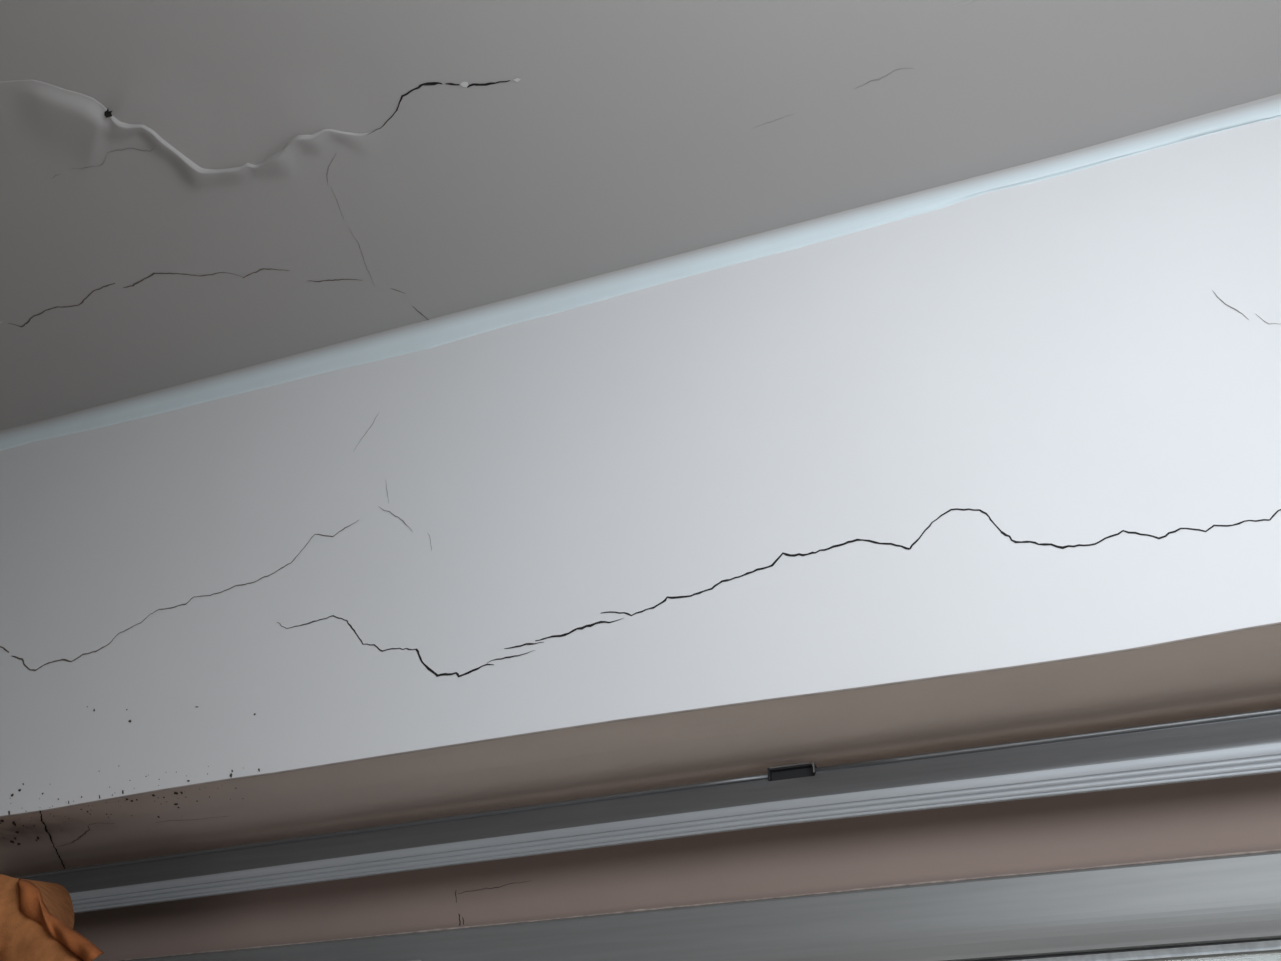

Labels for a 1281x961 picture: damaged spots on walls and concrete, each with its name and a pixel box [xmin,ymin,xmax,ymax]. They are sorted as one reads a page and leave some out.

crack [369,80,510,134]
crack [9,154,429,327]
crack [0,487,432,671]
crack [277,508,1281,677]
crack [39,810,115,869]
leakage [39,766,218,831]